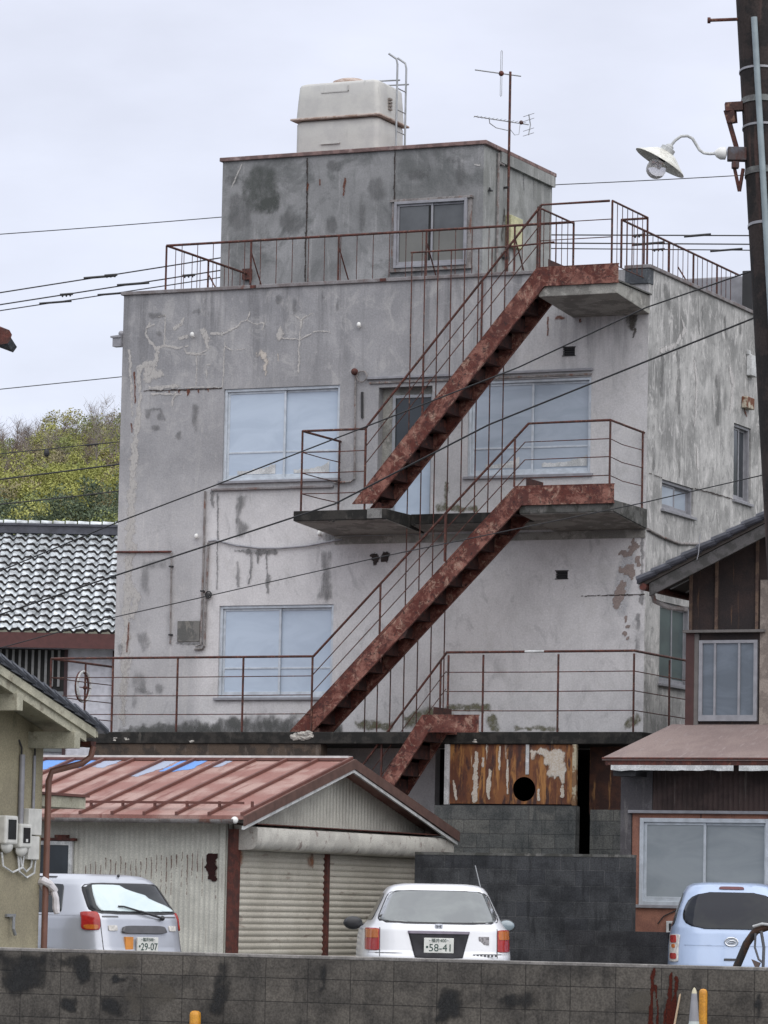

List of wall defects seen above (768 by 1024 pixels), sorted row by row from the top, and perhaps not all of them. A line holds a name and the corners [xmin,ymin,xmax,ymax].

leakage [231,162,279,212]
crack [136,312,330,406]
leakage [210,491,219,589]
leakage [236,496,247,534]
leakage [236,549,277,593]
spalling [612,538,641,640]
leakage [123,717,299,732]
leakage [2,955,45,994]
leakage [61,998,76,1012]
leakage [60,956,90,983]
leakage [209,964,228,1014]
corrosion [648,968,679,1024]